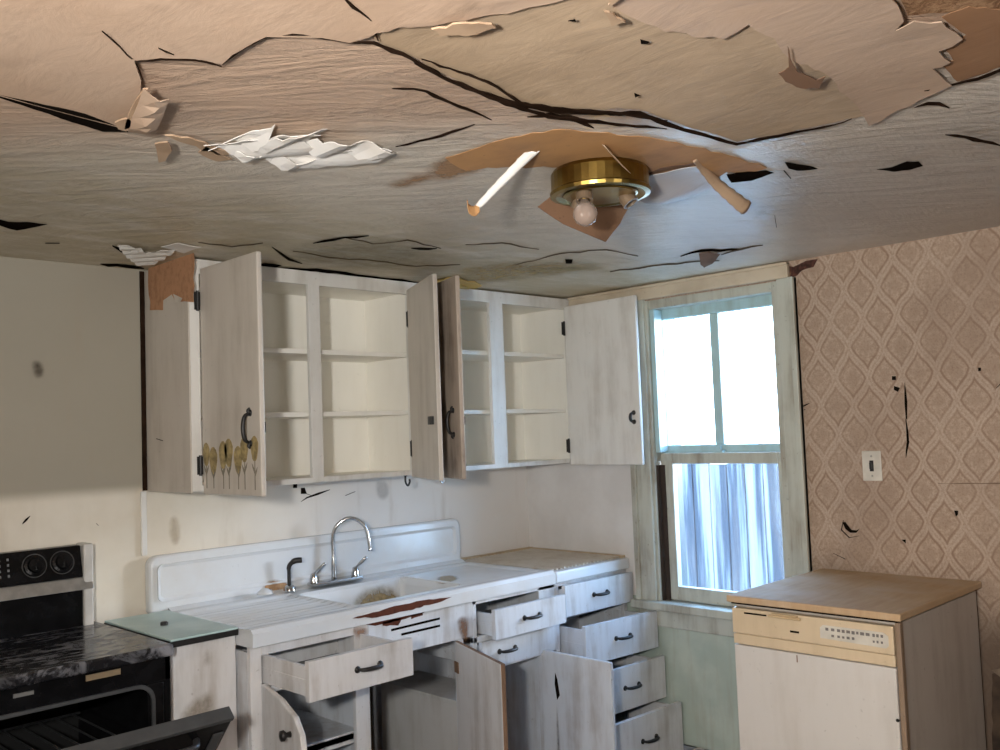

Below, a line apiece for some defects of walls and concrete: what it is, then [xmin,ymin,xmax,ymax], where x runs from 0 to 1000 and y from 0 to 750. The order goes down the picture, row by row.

crack [102,0,852,147]
peeling [0,0,1000,163]
crack [914,69,1000,109]
crack [0,95,128,132]
peeling [446,129,773,217]
crack [784,162,817,179]
crack [877,161,923,172]
peeling [538,197,627,242]
peeling [148,253,195,310]
crack [261,235,419,283]
corrosion [355,590,451,635]
peeling [991,669,1000,750]